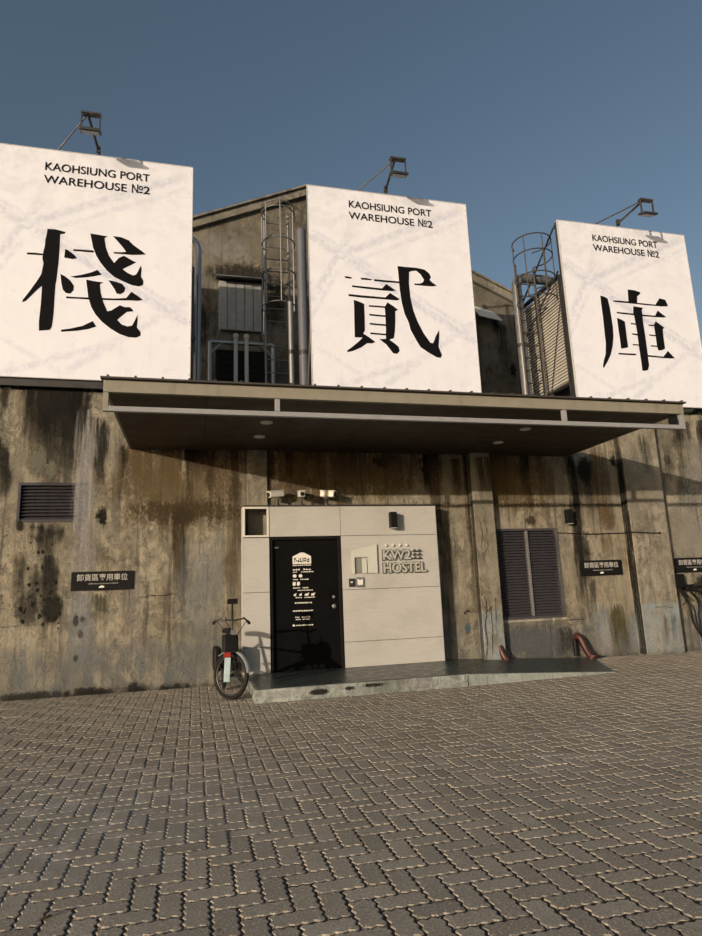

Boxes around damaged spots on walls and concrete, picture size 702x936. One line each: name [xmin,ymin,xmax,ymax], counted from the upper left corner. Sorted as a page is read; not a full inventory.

damp [0,438,11,492]
damp [16,520,63,623]
damp [22,387,129,537]
damp [70,594,105,644]
damp [135,450,241,575]
damp [566,455,596,596]
damp [593,438,647,654]
damp [662,420,702,484]